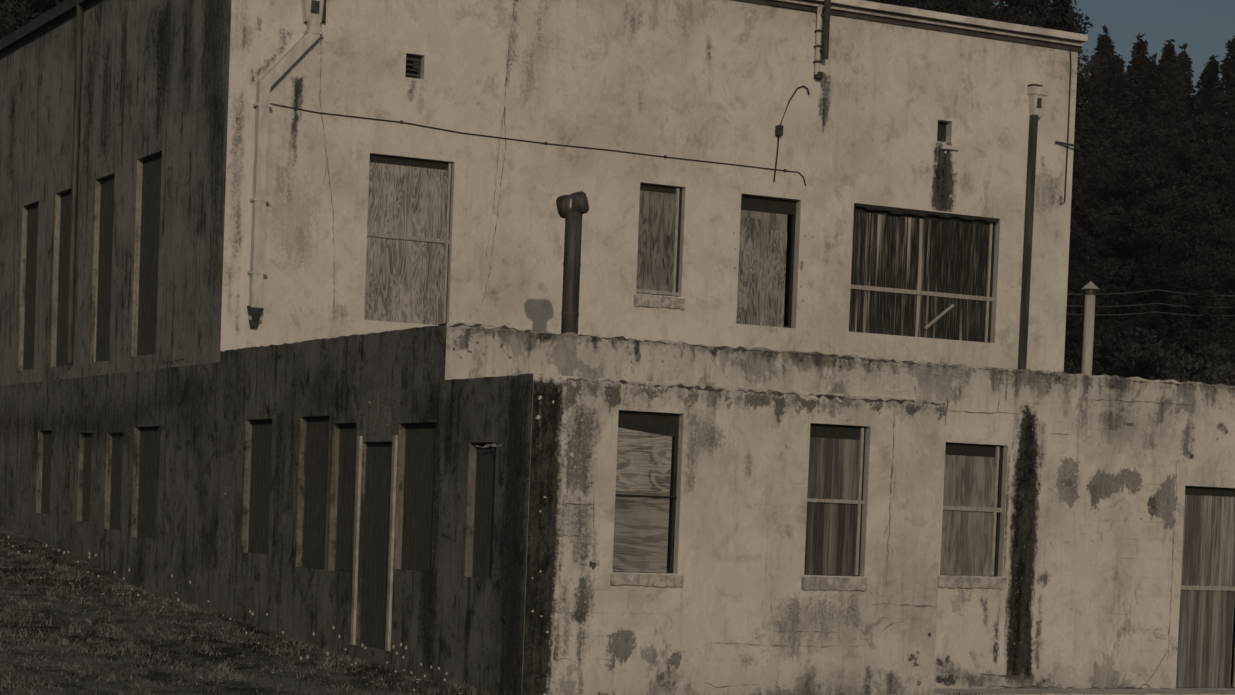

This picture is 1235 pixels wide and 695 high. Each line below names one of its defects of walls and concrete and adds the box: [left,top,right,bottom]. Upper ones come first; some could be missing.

leakage [498,377,600,695]
leakage [980,372,1048,682]
peeling [1057,458,1178,544]